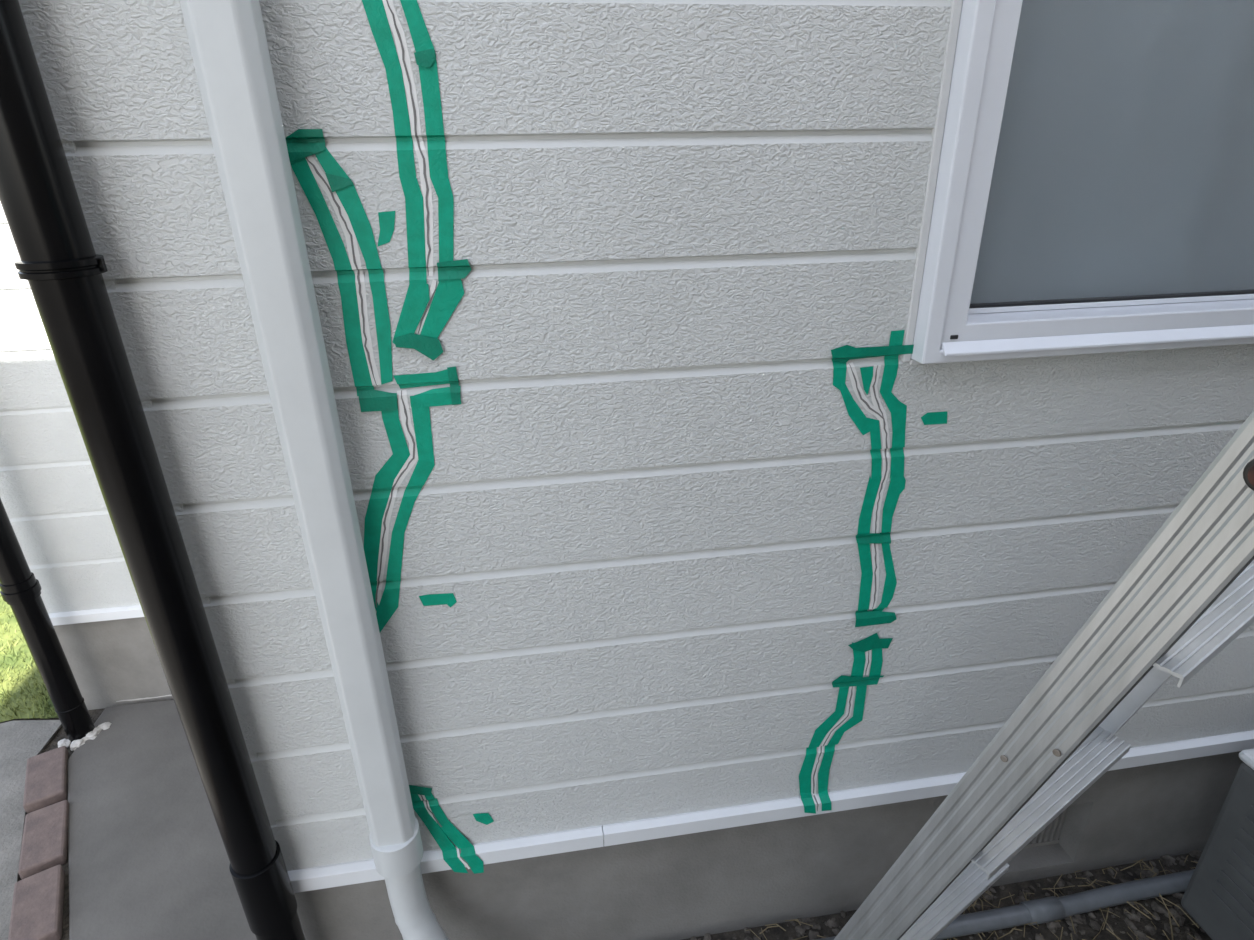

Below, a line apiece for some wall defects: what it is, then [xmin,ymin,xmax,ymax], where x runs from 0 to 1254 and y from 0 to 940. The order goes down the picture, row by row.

crack [386,0,437,334]
crack [306,157,415,608]
crack [849,364,888,610]
crack [421,795,471,868]
crack [813,652,869,811]